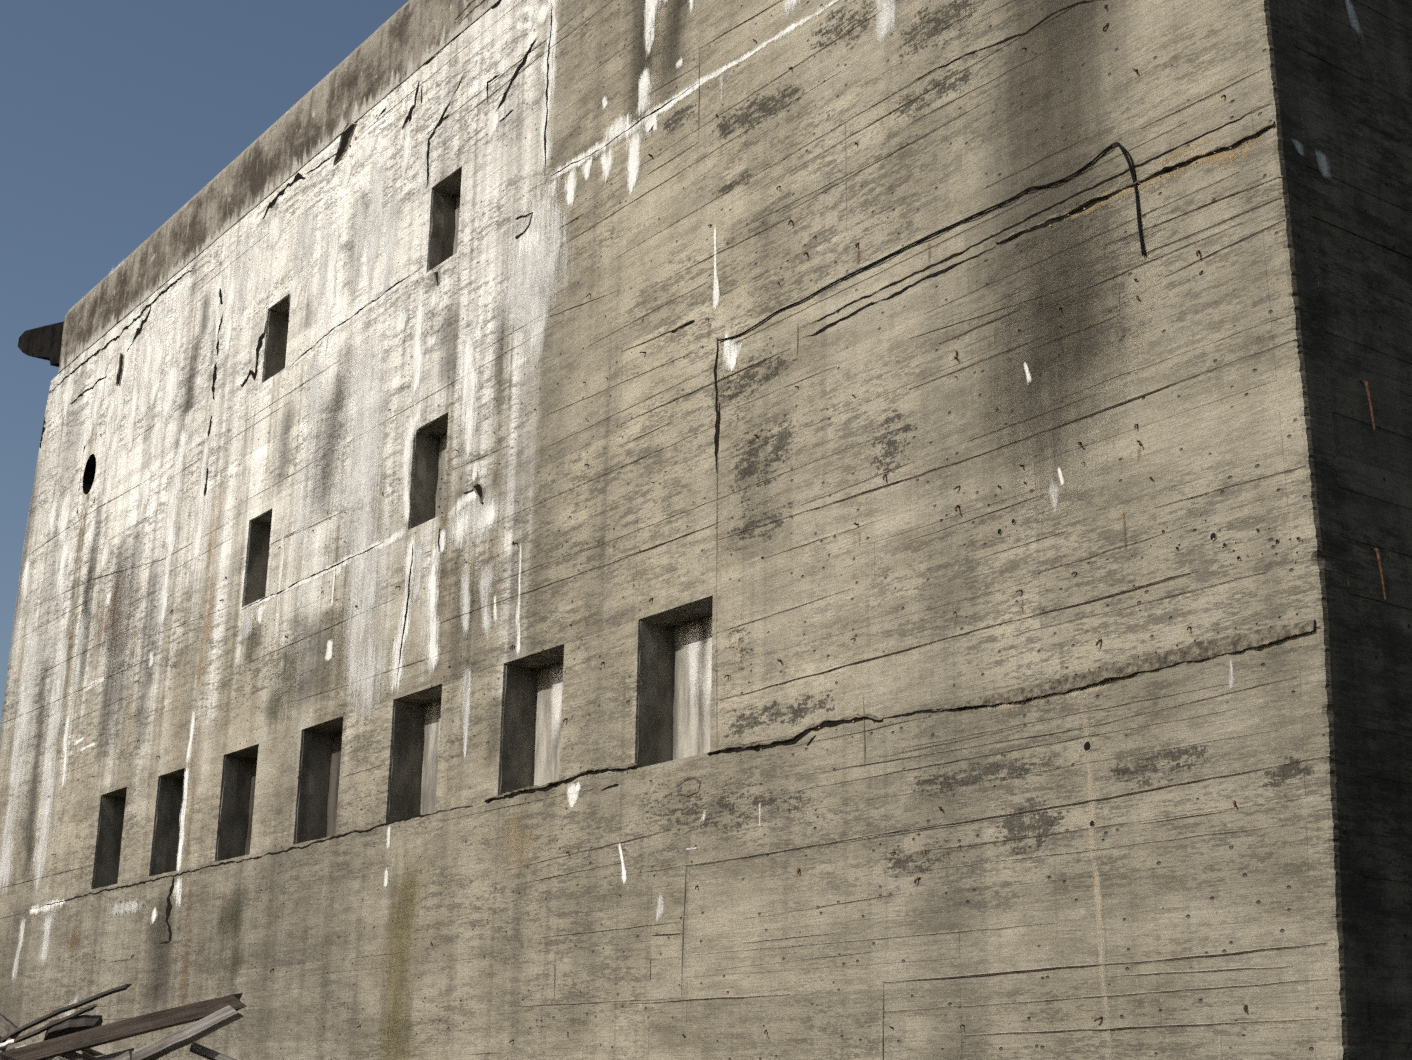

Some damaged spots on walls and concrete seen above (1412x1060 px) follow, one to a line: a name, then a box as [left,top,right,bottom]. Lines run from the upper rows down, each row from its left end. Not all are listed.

water stain [636,0,693,114]
water stain [710,82,804,139]
water stain [811,0,878,53]
crack [262,153,336,219]
crack [797,103,1275,339]
crack [40,265,423,496]
water stain [49,282,208,627]
water stain [390,286,484,692]
efflorescence [461,568,497,634]
efflorescence [463,672,471,756]
crack [707,709,963,755]
crack [31,763,637,944]